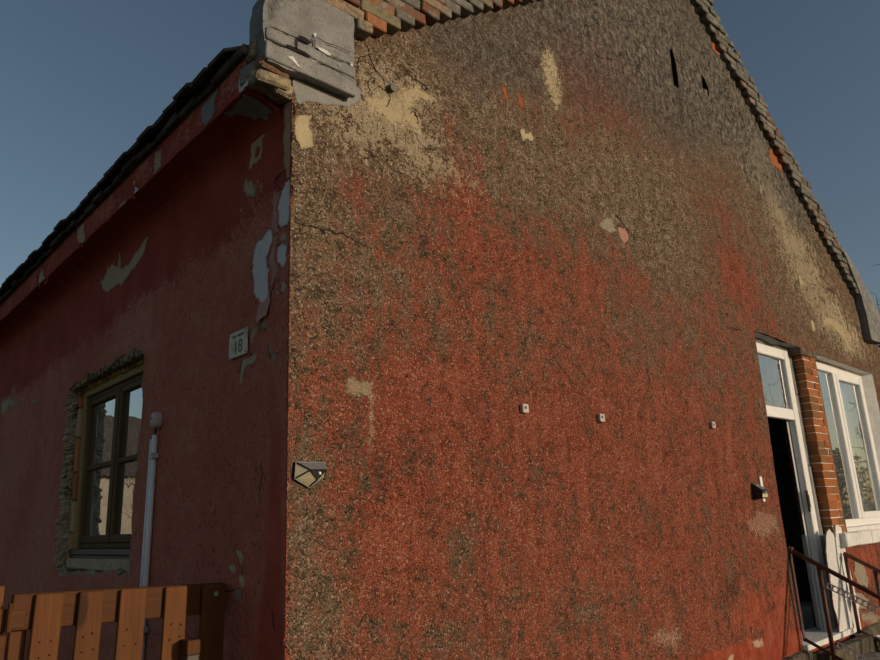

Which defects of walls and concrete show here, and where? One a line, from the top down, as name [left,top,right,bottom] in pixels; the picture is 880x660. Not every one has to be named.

crack [269,26,391,106]
flaking render [540,49,563,110]
peeling [100,234,151,294]
flaking render [201,74,441,388]